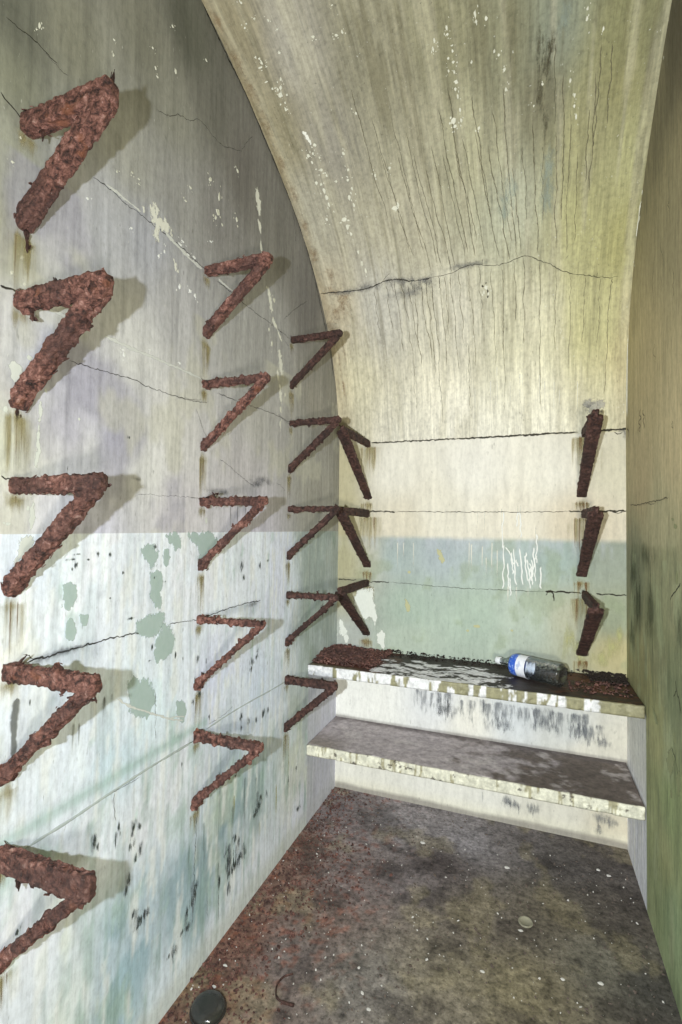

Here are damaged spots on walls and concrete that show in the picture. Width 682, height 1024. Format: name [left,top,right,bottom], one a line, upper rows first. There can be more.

crack [159,5,619,375]
corrosion [15,229,31,253]
crack [372,428,629,444]
water stain [469,506,542,596]
peeling [63,582,89,641]
crack [25,632,139,663]
peeling [135,517,218,664]
peeling [354,587,385,649]
peeling [127,676,156,720]
water stain [526,710,601,737]
water stain [115,824,141,896]
water stain [218,834,245,896]